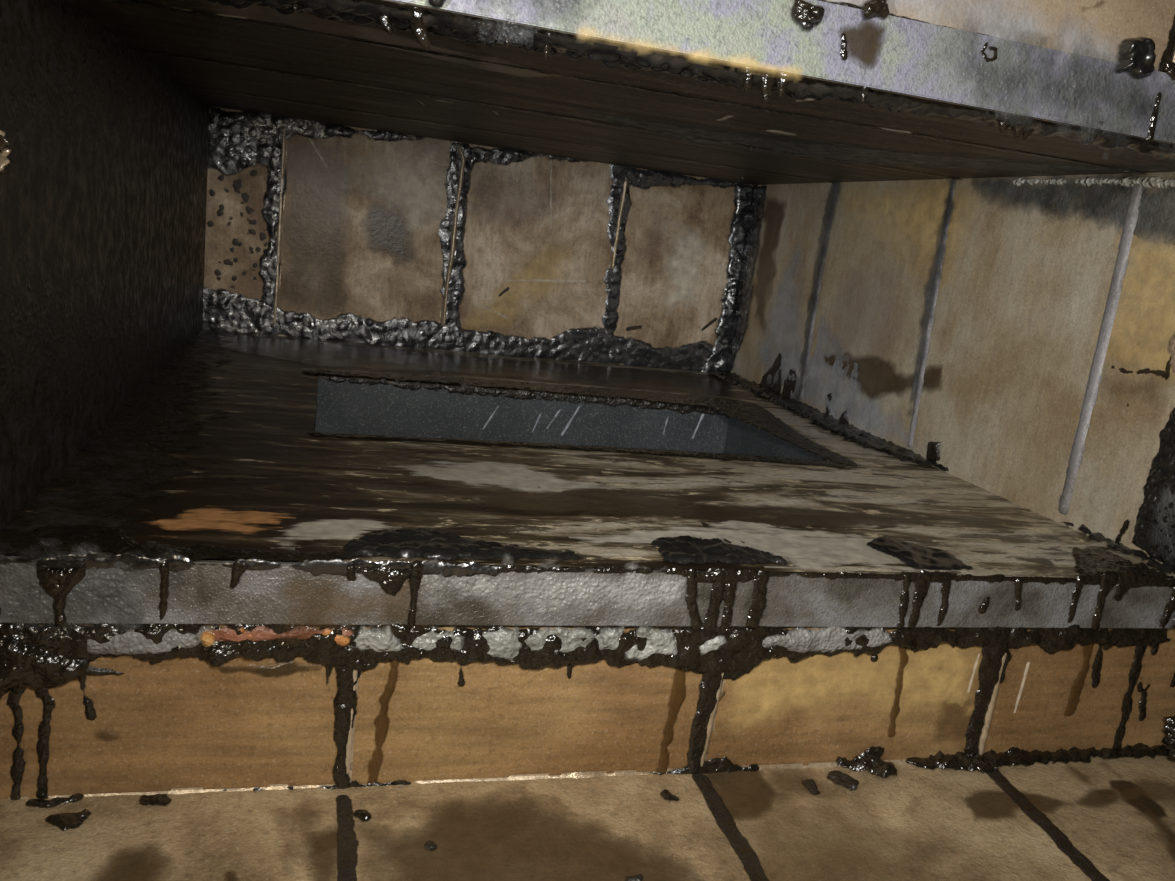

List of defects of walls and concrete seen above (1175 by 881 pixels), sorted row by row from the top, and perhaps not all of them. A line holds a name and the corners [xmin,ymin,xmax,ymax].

peeling [0,130,11,175]
water stain [760,182,884,432]
corrosion [201,626,352,645]
water stain [78,674,97,721]
water stain [6,688,55,800]